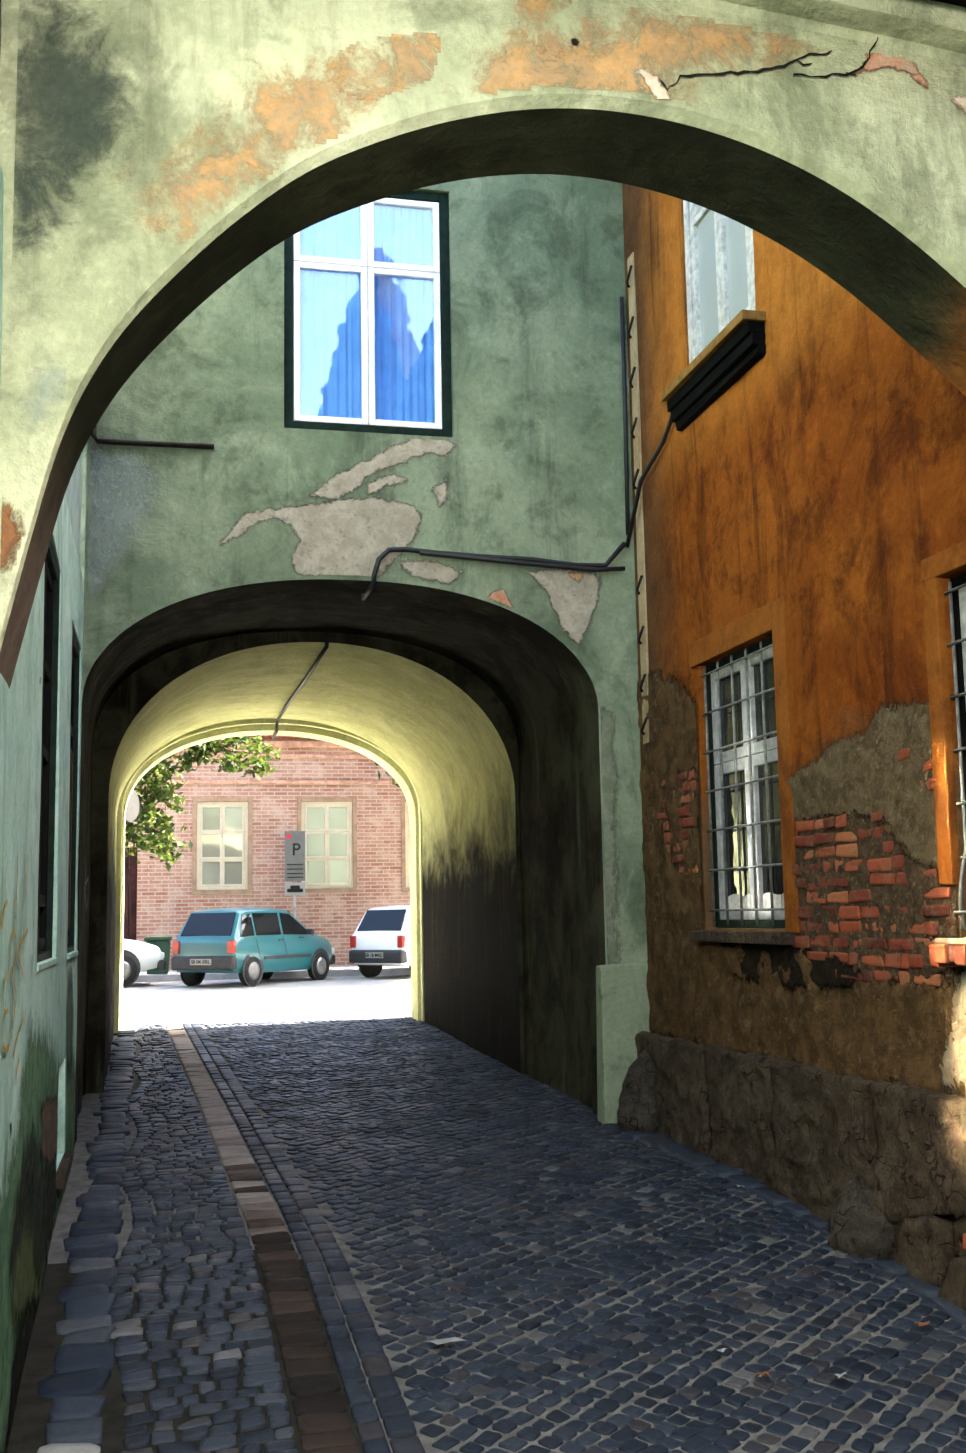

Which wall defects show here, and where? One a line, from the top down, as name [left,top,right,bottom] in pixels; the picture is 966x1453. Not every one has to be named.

peeling [161,32,441,238]
peeling [479,0,811,100]
crack [659,37,878,90]
flaking render [950,94,966,113]
peeling [219,438,463,584]
flaking render [487,589,513,607]
peeling [528,569,601,644]
flaking render [637,669,966,1098]
leakage [0,1121,57,1453]